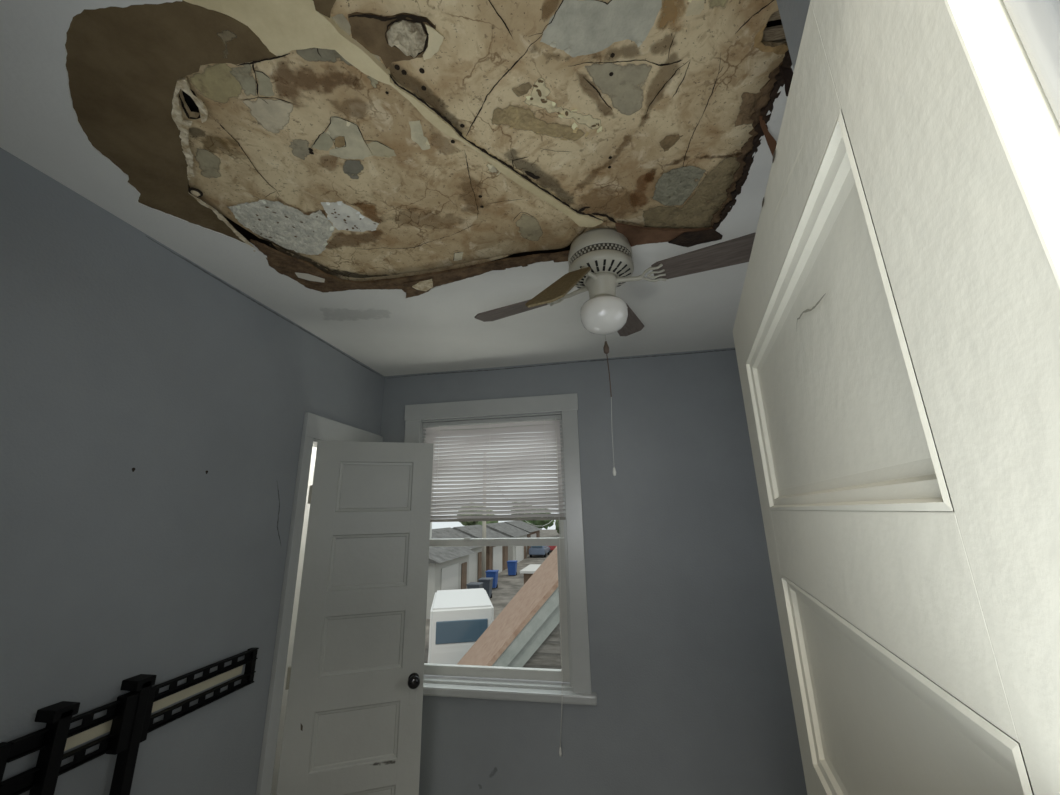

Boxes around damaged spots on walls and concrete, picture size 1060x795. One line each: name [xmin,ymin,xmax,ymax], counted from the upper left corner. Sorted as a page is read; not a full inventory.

crack [735,0,774,34]
crack [236,53,296,105]
crack [573,36,690,117]
crack [220,124,278,197]
crack [311,117,393,153]
spalling [177,0,789,298]
crack [368,0,617,261]
crack [678,54,723,201]
crack [797,293,826,320]